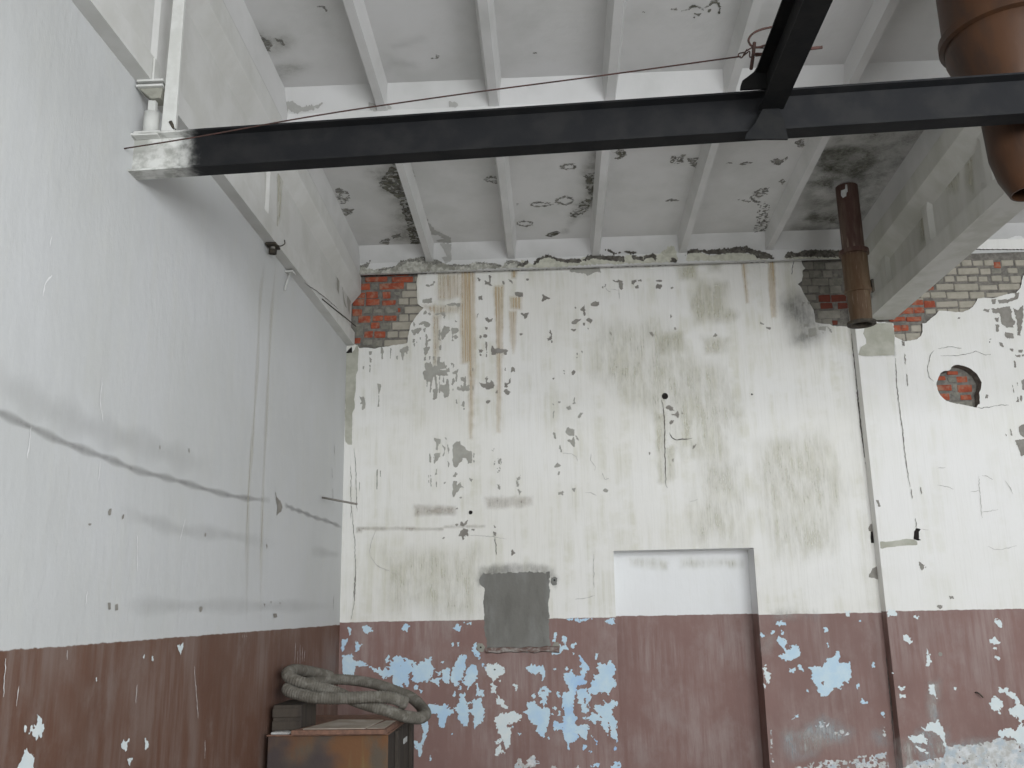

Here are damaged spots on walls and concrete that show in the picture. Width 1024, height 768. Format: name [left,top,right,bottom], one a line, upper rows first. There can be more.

leakage [379,167,420,244]
leakage [818,148,904,201]
flaking render [337,274,515,445]
corrosion [447,272,471,376]
flaking render [798,259,849,338]
flaking render [858,236,1024,368]
spalling [936,368,988,407]
flaking render [341,571,621,768]
peeling [760,620,868,704]
peeling [17,715,45,768]
peeling [908,719,946,754]
peeling [989,687,1024,744]